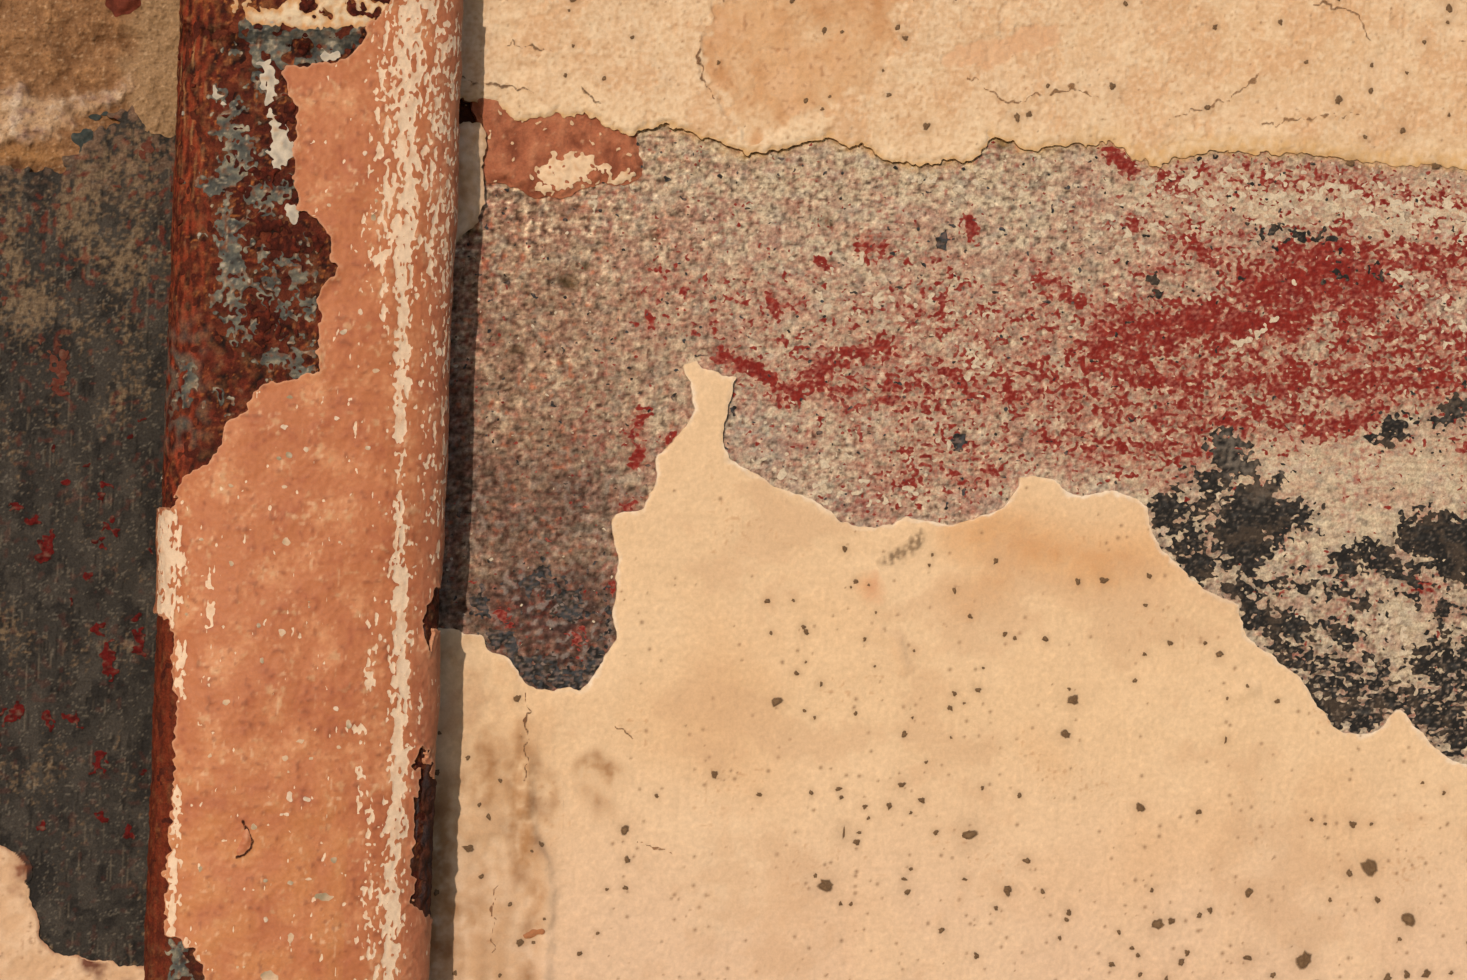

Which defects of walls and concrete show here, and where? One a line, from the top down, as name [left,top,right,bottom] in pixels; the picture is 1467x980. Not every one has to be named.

peeling [0,0,236,971]
corrosion [161,0,390,509]
peeling [252,598,327,639]
corrosion [410,748,437,917]
corrosion [423,588,439,646]
peeling [296,0,1467,980]